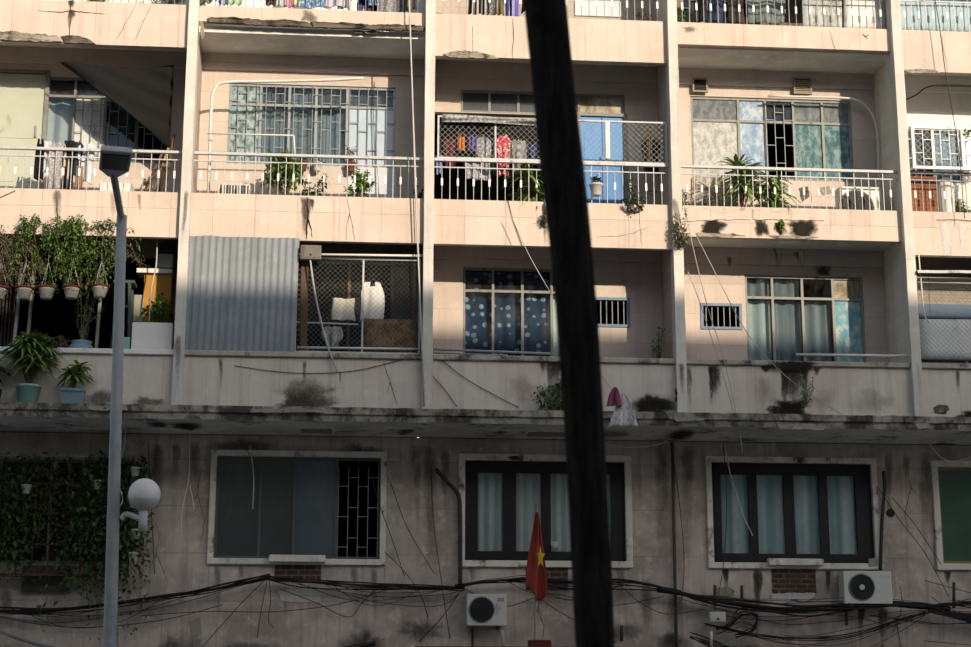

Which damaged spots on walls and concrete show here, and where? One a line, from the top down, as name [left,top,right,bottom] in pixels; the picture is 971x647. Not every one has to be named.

crack [38,6,101,35]
leakage [301,199,314,223]
leakage [702,220,727,237]
leakage [756,220,769,235]
leakage [789,220,817,263]
peeling [941,221,968,255]
leakage [281,362,333,407]
leakage [709,365,720,396]
leakage [761,361,821,414]
leakage [633,395,673,412]